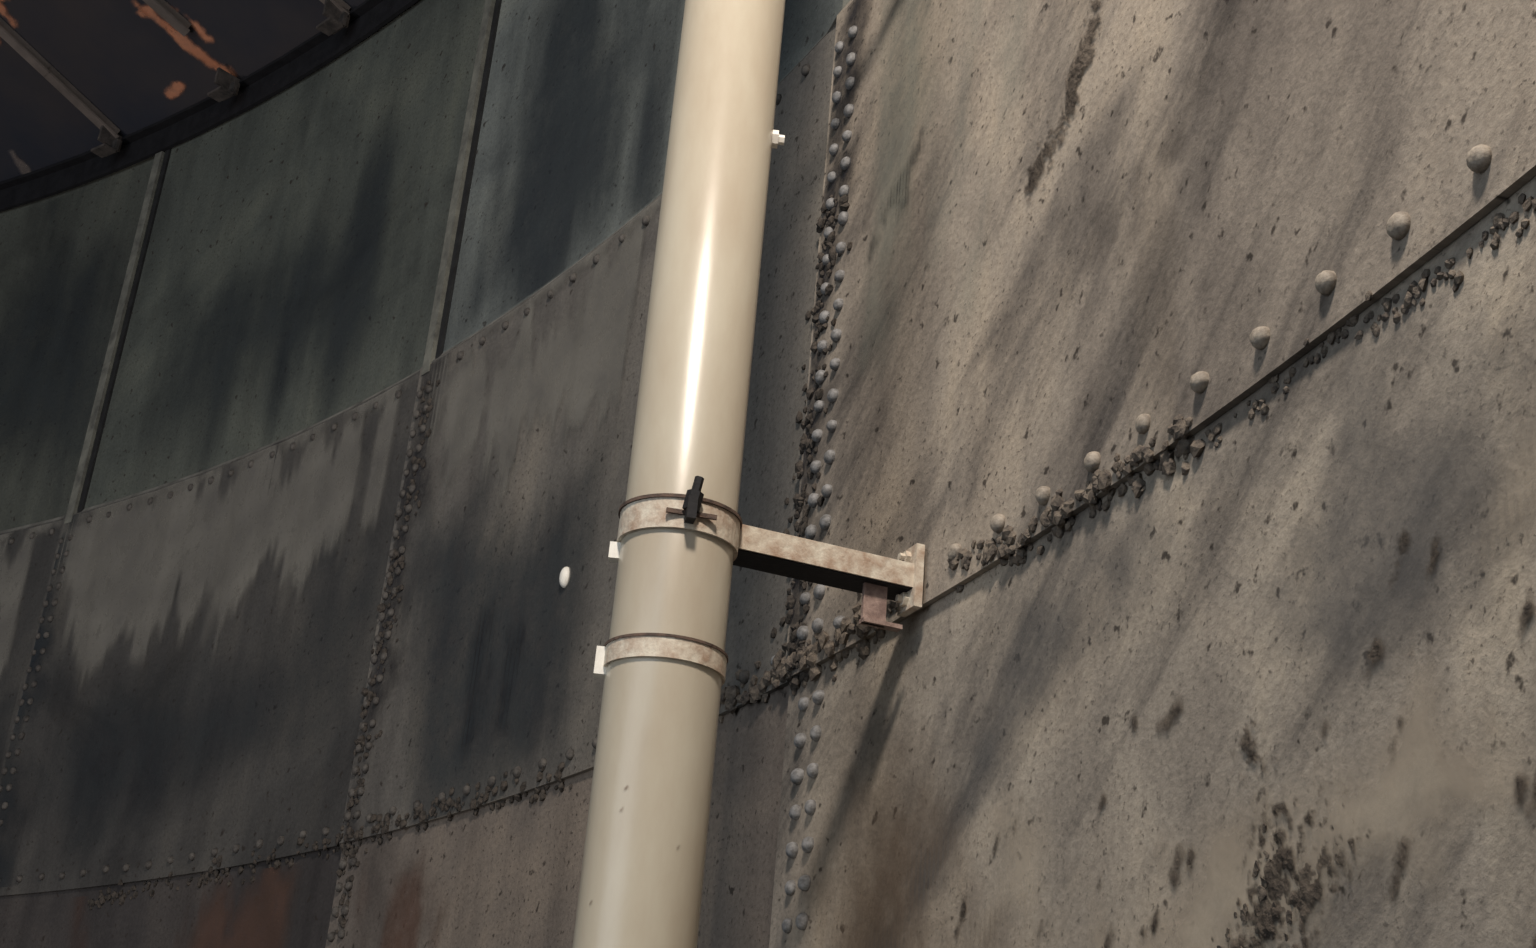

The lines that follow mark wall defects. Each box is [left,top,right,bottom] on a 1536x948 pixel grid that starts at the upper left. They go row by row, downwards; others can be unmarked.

rust [166,82,184,98]
rust [135,3,235,76]
damp [401,195,662,515]
damp [0,385,398,722]
damp [423,527,579,792]